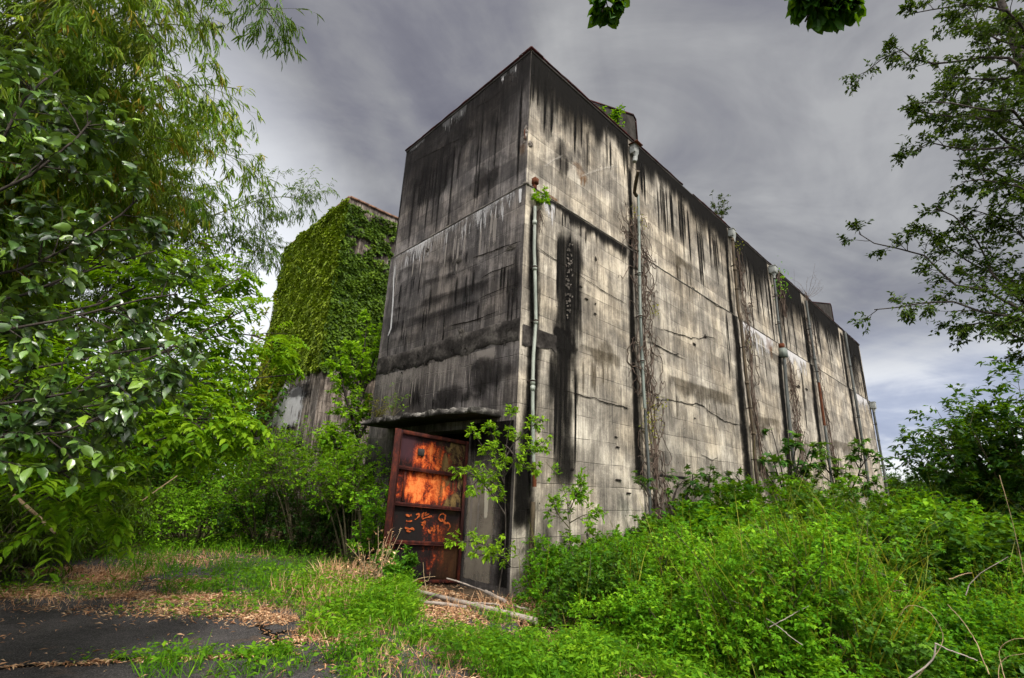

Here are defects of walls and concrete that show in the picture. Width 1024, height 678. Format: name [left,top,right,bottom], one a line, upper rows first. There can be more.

leakage [380,51,873,529]
crack [564,390,625,407]
crack [659,399,741,428]